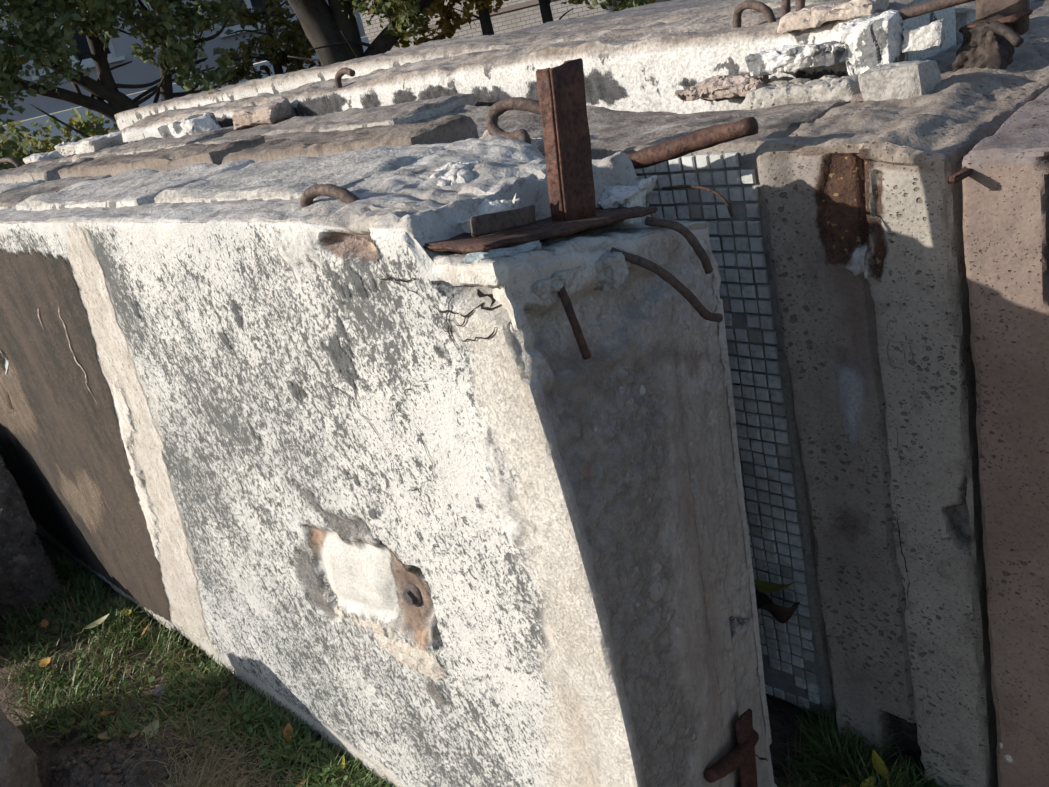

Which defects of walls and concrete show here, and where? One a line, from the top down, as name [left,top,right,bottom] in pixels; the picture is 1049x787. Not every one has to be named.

rust [627,117,759,169]
spalling [645,216,713,274]
peeling [226,300,243,329]
peeling [319,231,385,390]
spalling [558,286,591,360]
spalling [611,247,723,322]
peeling [287,381,307,404]
spalling [290,482,447,706]